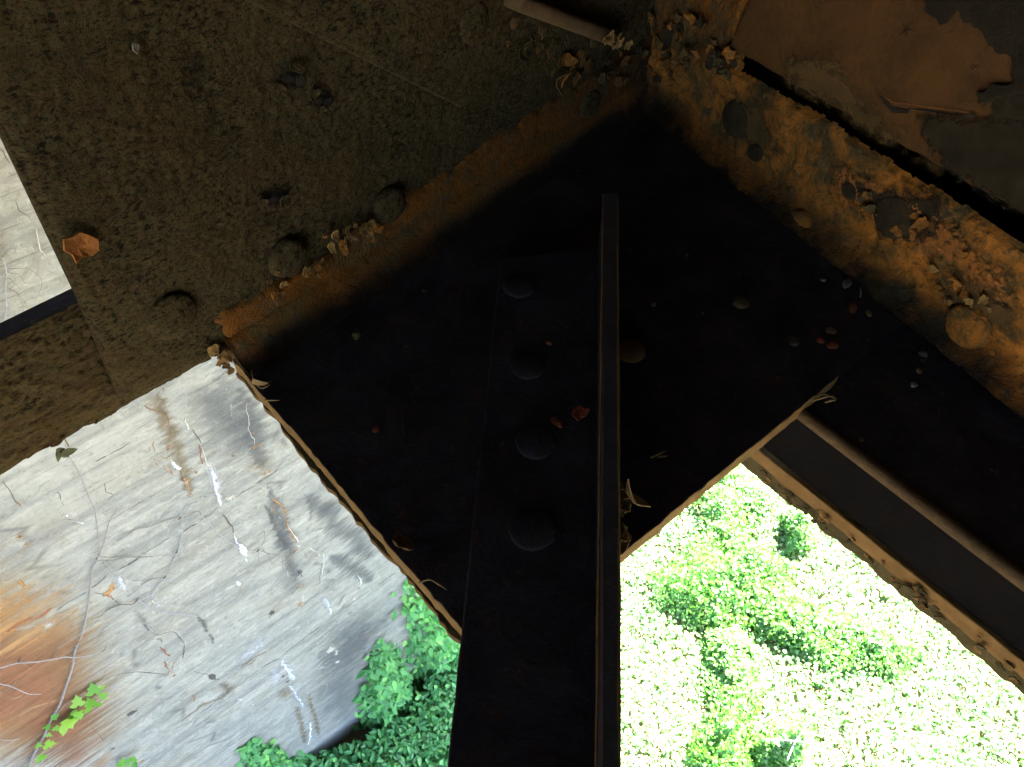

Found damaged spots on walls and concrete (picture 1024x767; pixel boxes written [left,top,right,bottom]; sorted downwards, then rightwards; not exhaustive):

peeling [782,52,900,145]
corrosion [302,219,384,279]
peeling [829,148,1020,338]
corrosion [890,198,1001,329]
crack [93,388,397,698]
leakage [309,499,372,582]
corrosion [0,581,103,767]